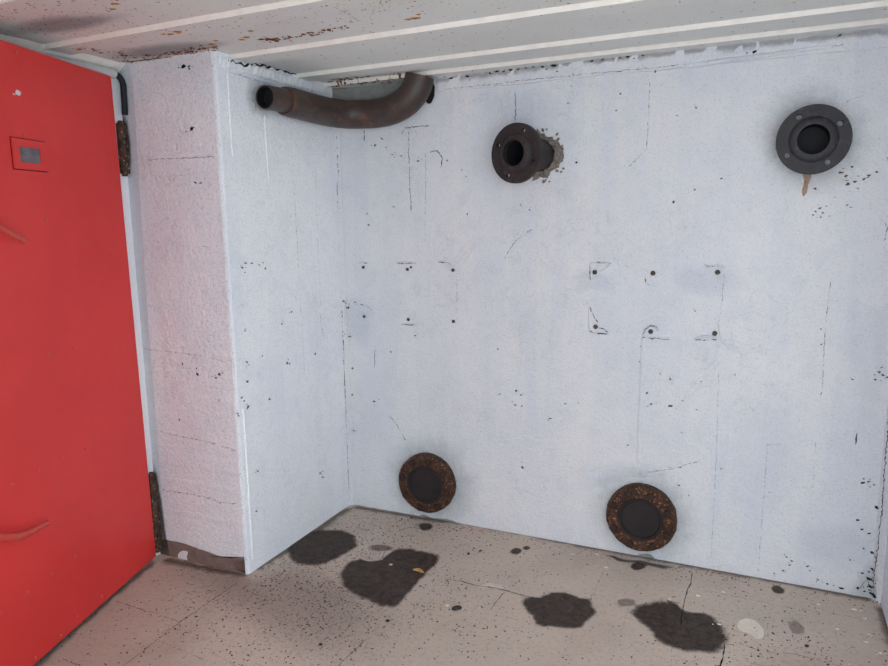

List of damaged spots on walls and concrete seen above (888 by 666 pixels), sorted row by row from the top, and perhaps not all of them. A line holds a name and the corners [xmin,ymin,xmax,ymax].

rust [2,0,353,63]
rust [802,174,811,197]
damp [288,530,438,607]
damp [523,592,596,628]
damp [633,601,727,652]